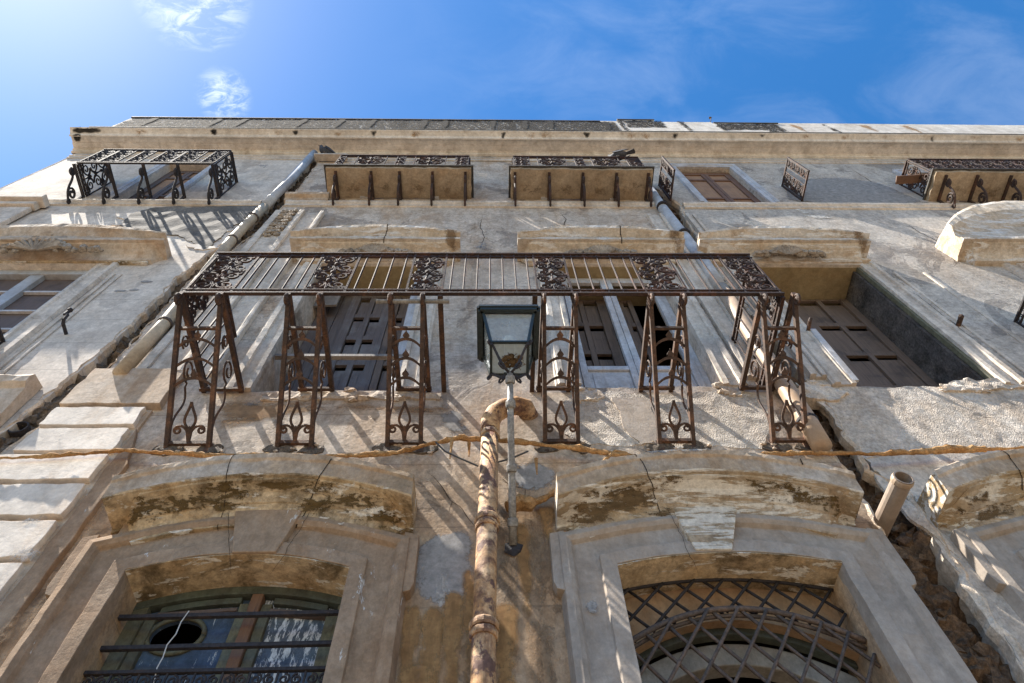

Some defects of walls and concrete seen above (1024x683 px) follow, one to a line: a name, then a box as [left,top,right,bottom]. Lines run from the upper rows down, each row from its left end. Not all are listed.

crack [217,454,236,566]
water stain [127,478,401,529]
crack [271,459,338,573]
corrosion [496,506,556,683]
crack [635,454,696,567]
water stain [745,478,848,521]
crack [812,401,1024,683]